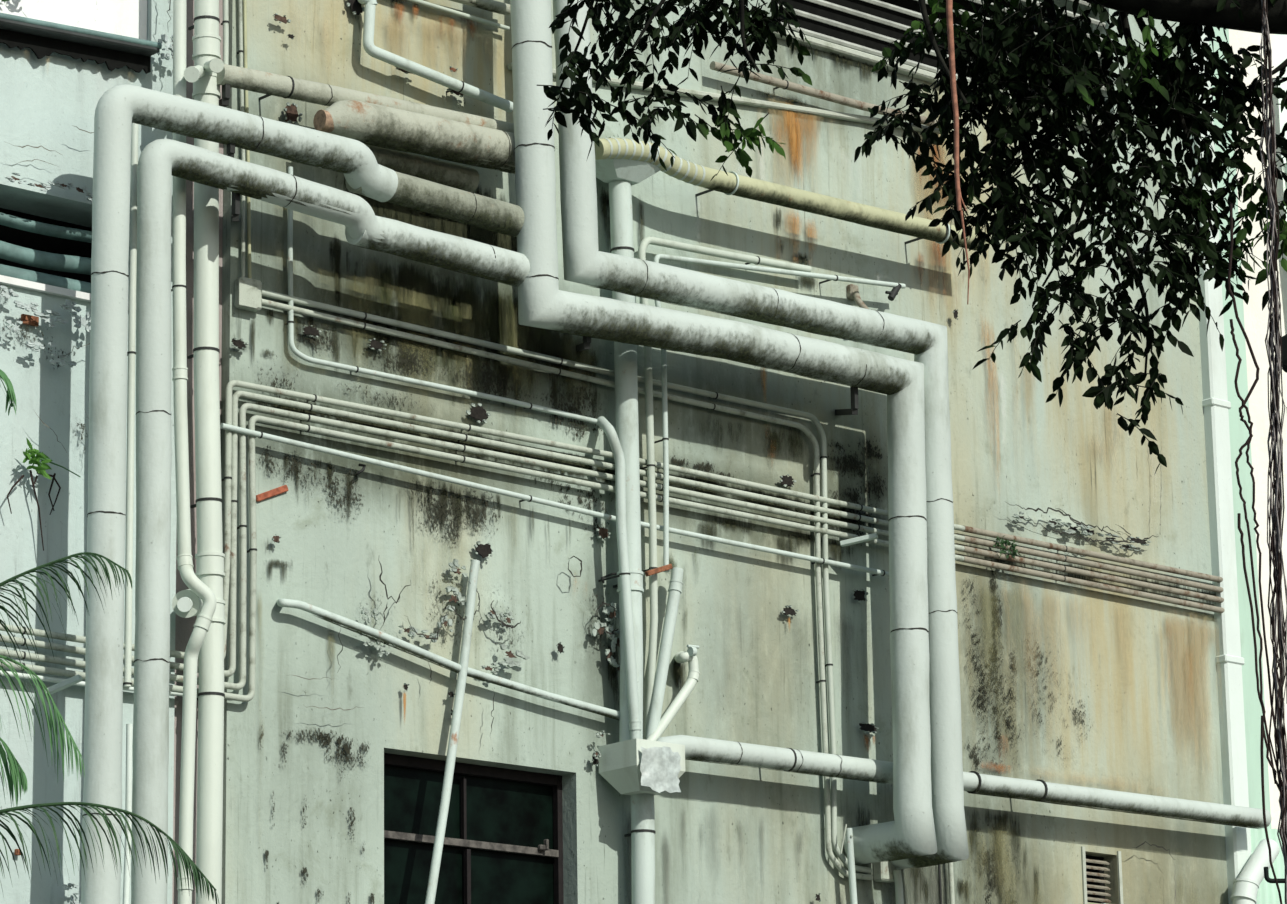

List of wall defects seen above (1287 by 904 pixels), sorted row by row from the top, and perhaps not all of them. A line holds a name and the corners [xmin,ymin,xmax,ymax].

rust [785,110,802,167]
peeling [0,286,91,368]
damp [132,116,932,438]
damp [251,311,616,545]
damp [669,436,886,562]
peeling [1012,511,1151,551]
crack [378,559,450,681]
peeling [361,541,494,658]
peeling [481,609,530,675]
peeling [592,603,620,671]
damp [281,728,369,781]
damp [874,544,1261,904]